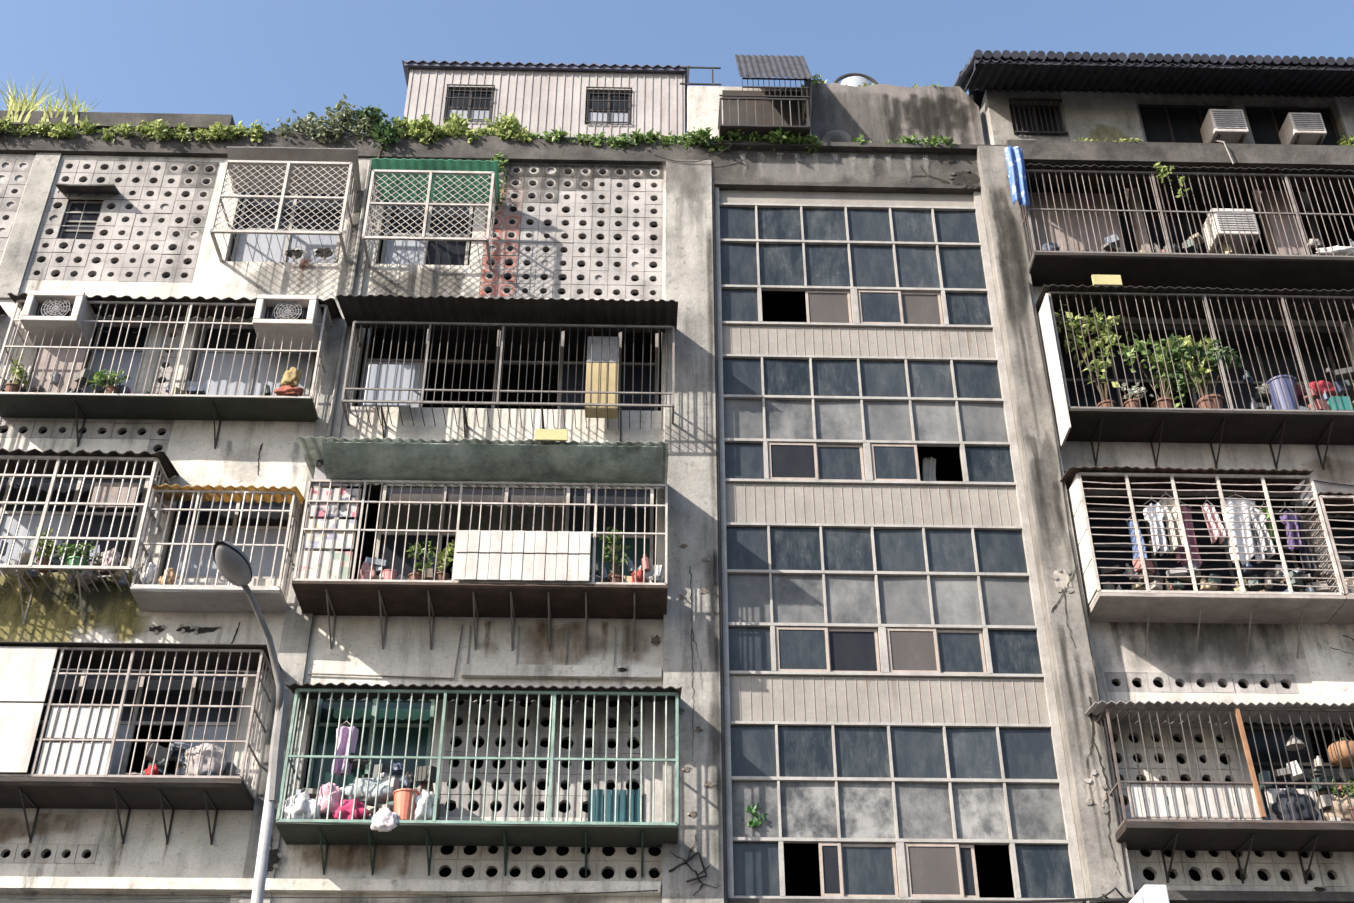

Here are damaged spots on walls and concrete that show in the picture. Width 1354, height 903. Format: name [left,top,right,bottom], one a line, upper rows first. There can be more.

damp [820,93,974,168]
damp [35,580,128,613]
crack [668,829,717,896]